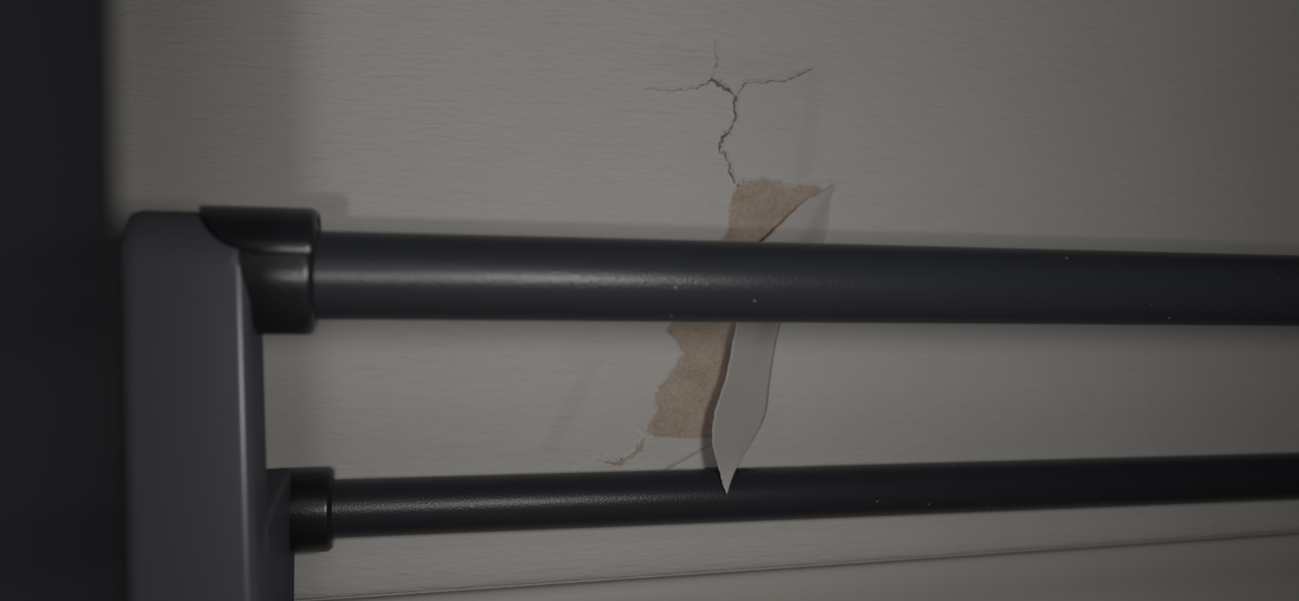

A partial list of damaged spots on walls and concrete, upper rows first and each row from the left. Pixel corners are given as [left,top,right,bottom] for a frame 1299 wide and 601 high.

crack [644,41,813,186]
peeling [716,175,837,243]
peeling [571,322,781,494]